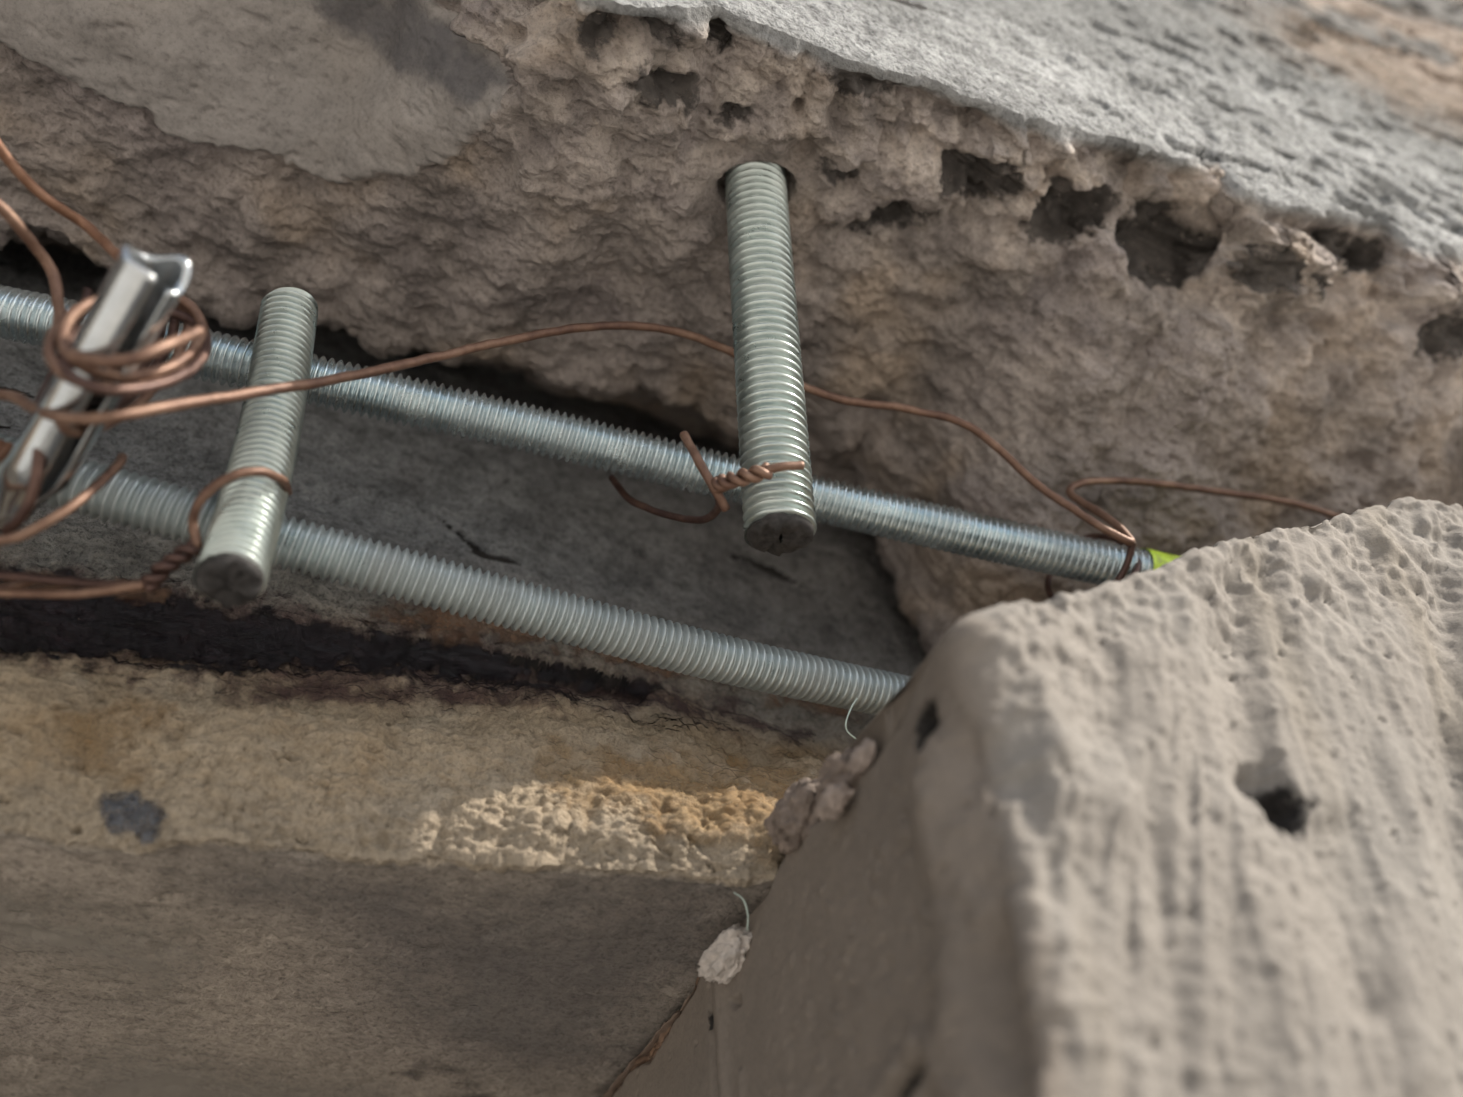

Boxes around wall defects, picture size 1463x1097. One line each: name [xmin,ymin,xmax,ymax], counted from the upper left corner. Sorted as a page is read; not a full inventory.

crack [892,0,948,15]
spalling [0,0,1463,556]
spalling [285,401,1100,676]
corrosion [0,564,858,847]
spalling [0,502,876,881]